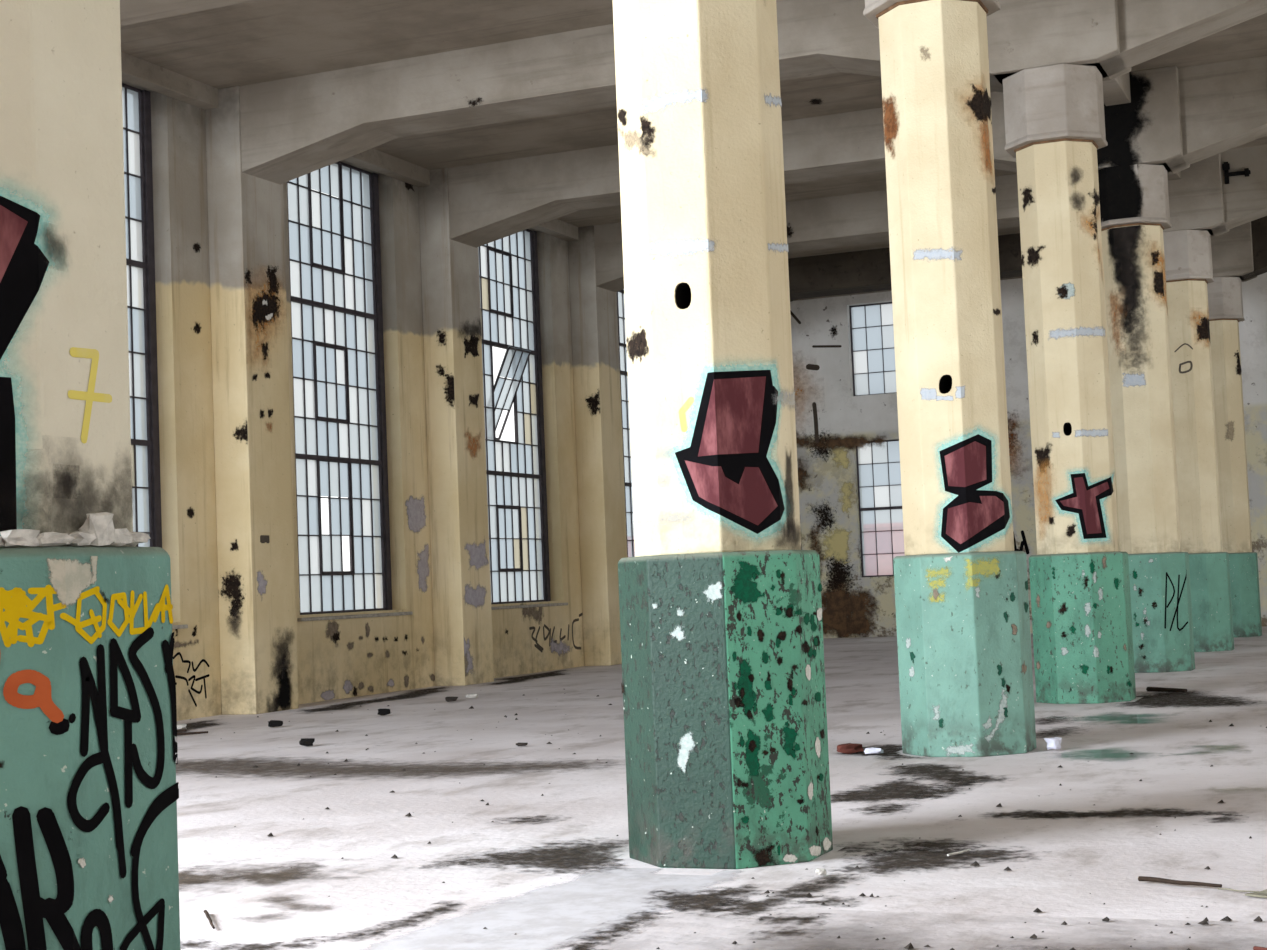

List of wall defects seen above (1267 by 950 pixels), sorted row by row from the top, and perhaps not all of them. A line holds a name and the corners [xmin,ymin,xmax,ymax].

rust [882,96,898,155]
rust [966,85,992,170]
rust [1085,189,1100,251]
rust [245,265,280,381]
leakage [1114,226,1143,365]
leakage [229,610,240,634]
leakage [273,634,291,676]
peeling [671,609,684,641]
peeling [704,483,877,788]
peeling [1046,556,1157,674]
peeling [677,732,695,773]
peeling [753,845,797,867]